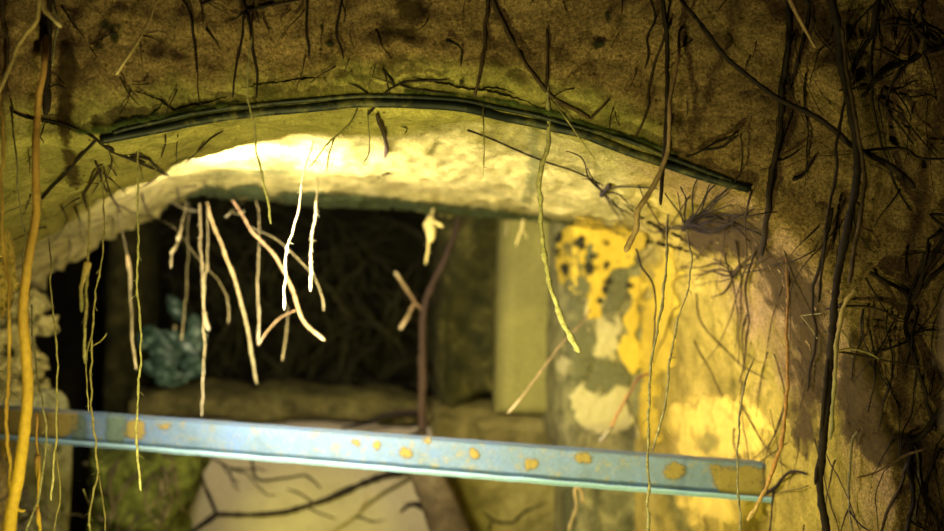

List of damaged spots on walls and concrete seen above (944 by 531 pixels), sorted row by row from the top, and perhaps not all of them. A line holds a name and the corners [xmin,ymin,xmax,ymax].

flaking render [556,216,778,461]
rust [399,447,413,459]
rust [524,458,538,471]
rust [574,452,591,464]
rust [662,461,686,480]
rust [709,464,769,497]
flaking render [676,495,770,531]